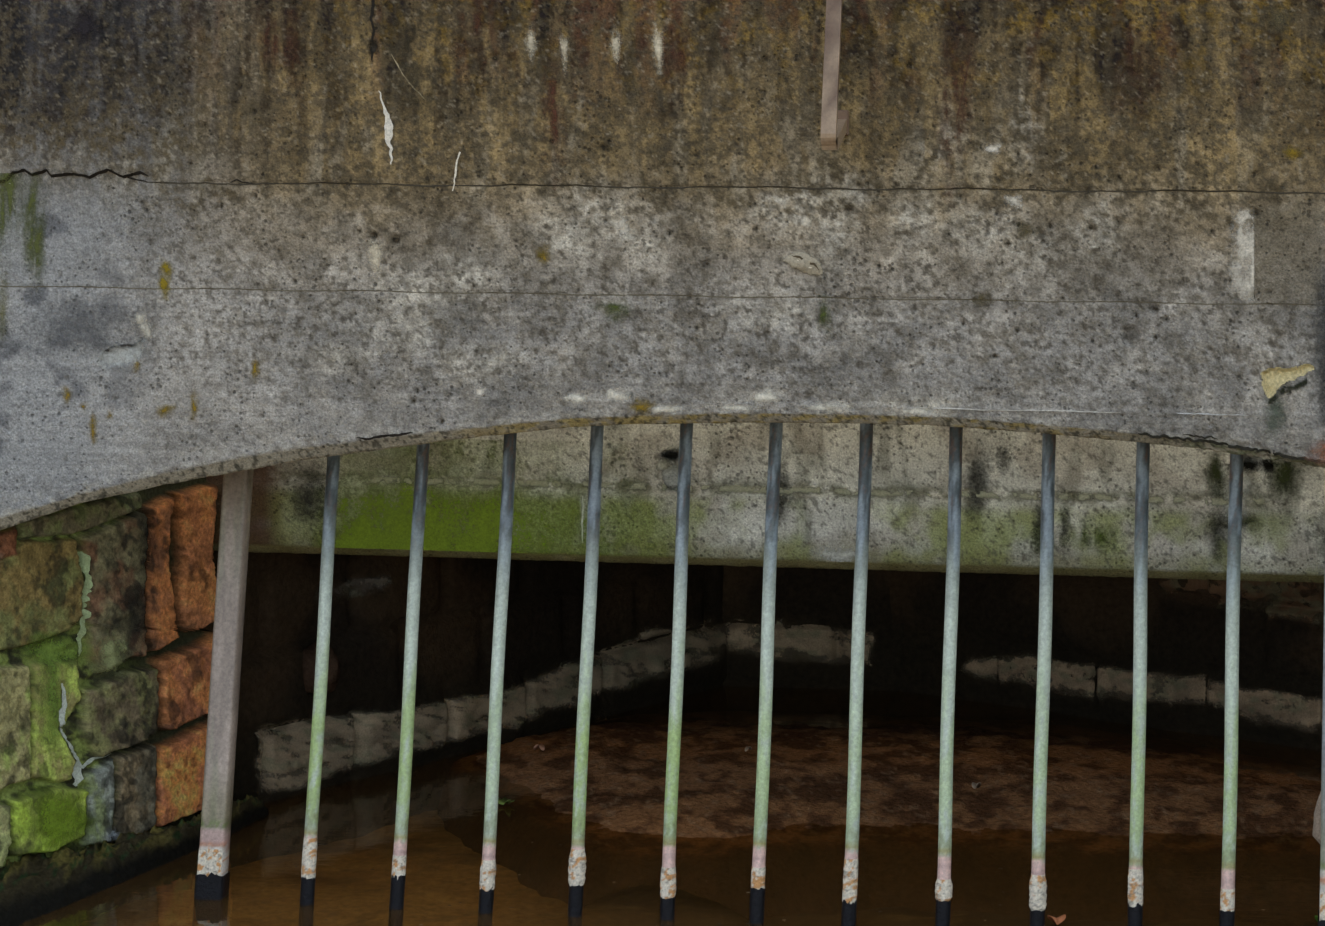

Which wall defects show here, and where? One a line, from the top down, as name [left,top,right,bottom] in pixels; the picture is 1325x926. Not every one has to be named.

crack [0,169,1325,194]
water stain [76,551,93,656]
water stain [823,548,855,562]
water stain [59,683,110,786]